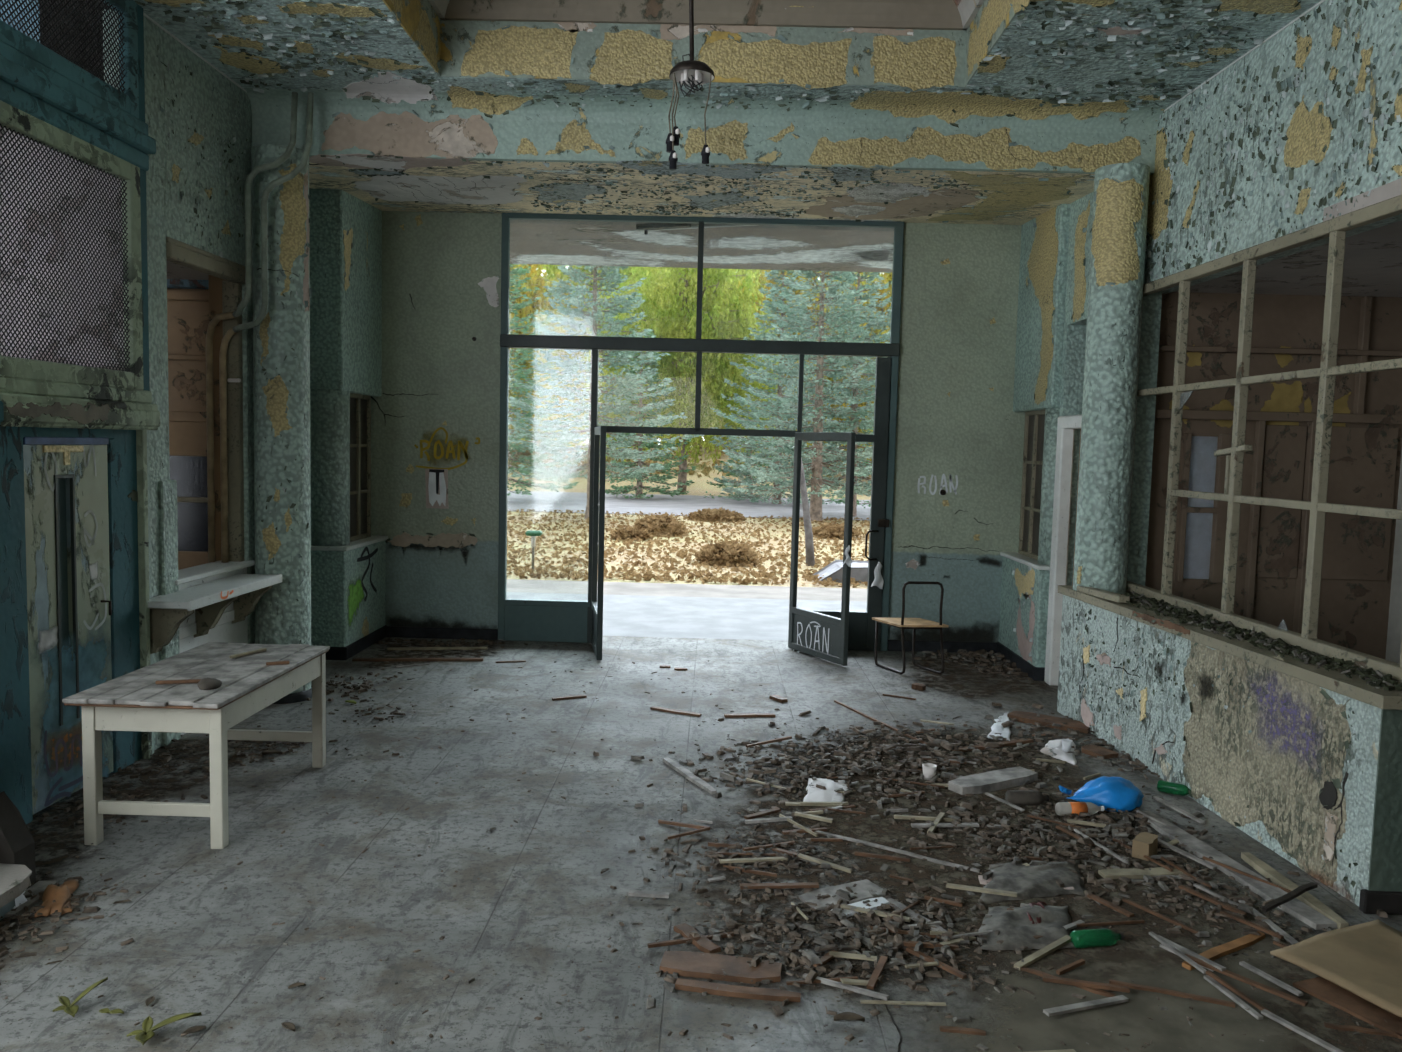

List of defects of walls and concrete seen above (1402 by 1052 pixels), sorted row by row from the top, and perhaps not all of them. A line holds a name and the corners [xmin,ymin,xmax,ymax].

peeling [135,0,1402,405]
peeling [257,312,307,439]
peeling [259,459,309,561]
peeling [1076,609,1364,888]